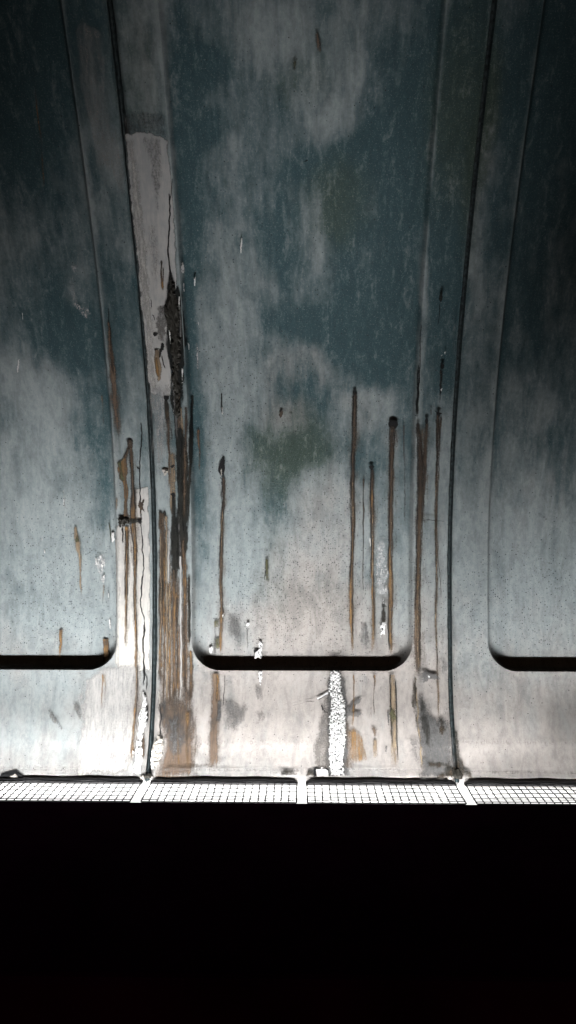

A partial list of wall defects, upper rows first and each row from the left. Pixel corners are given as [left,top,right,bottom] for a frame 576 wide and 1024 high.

peeling [125,132,196,569]
corrosion [101,309,138,756]
corrosion [158,396,193,702]
corrosion [214,477,226,653]
corrosion [349,366,442,715]
corrosion [209,673,221,767]
corrosion [349,675,398,763]